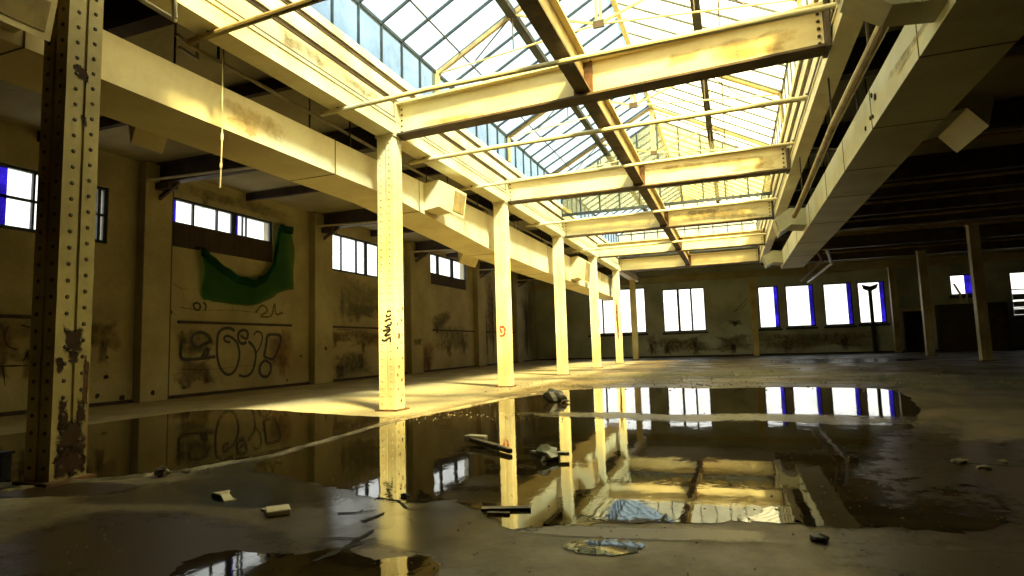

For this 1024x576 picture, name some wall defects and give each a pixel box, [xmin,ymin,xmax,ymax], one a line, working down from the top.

rust [721,37,773,59]
rust [52,356,90,479]